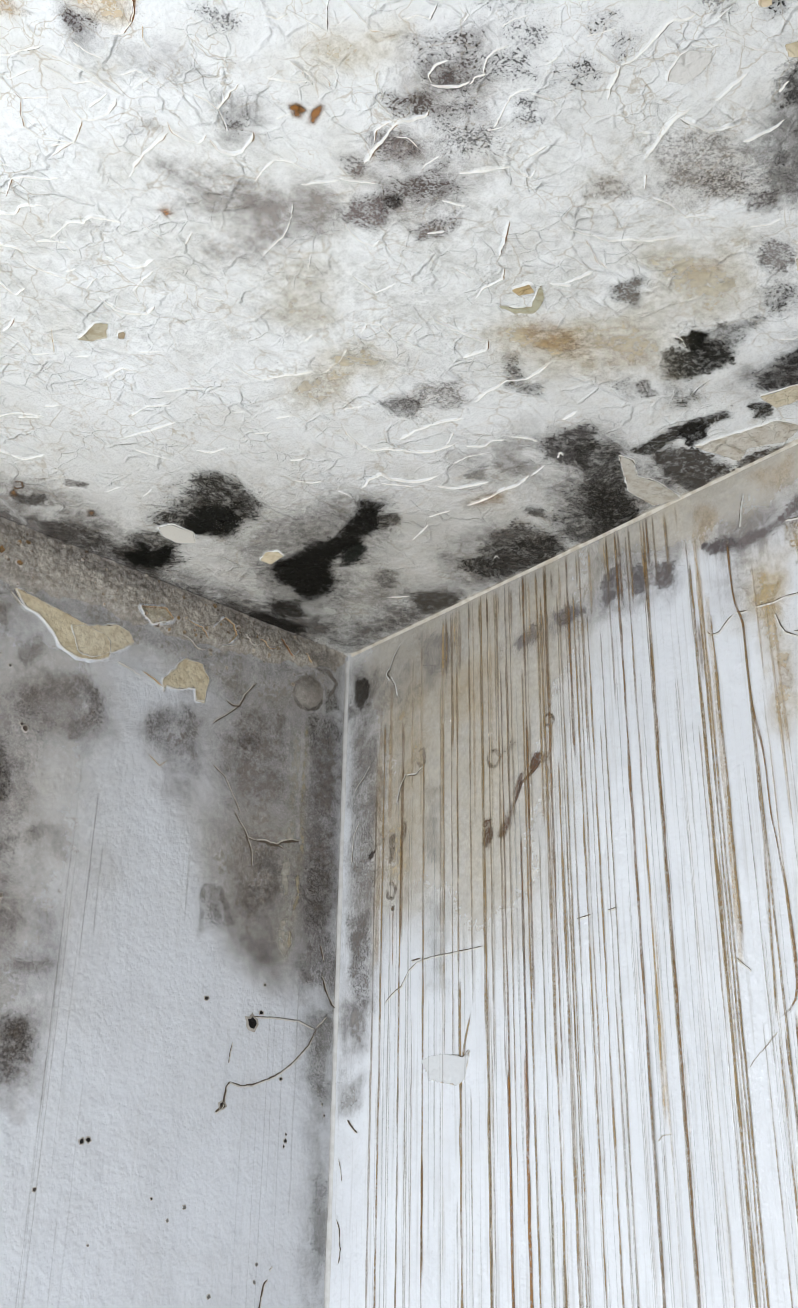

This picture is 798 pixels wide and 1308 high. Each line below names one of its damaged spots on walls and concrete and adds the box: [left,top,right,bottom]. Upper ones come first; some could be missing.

water stain [308,21,553,230]
peeling [427,44,509,89]
water stain [661,136,798,211]
spalling [456,221,681,314]
water stain [0,468,266,586]
spalling [617,453,682,506]
crack [737,494,745,527]
spalling [693,384,798,462]
spalling [0,517,347,705]
water stain [219,239,798,1094]
water stain [0,655,102,946]
crack [215,946,335,1114]